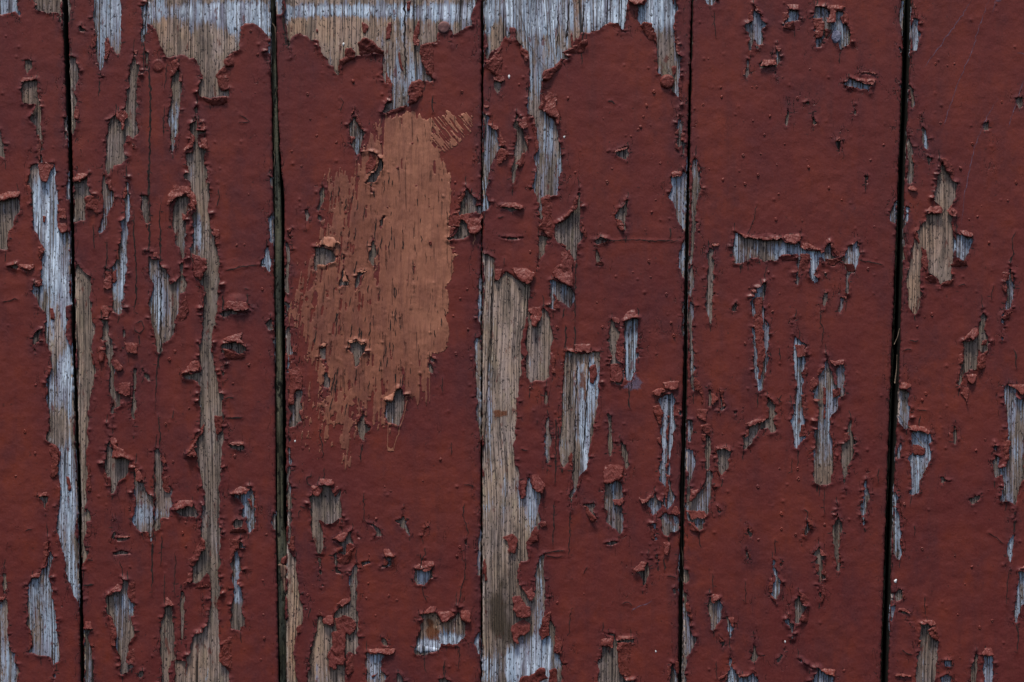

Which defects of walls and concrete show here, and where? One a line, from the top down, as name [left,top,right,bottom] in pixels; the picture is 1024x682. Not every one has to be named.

peeling [888,84,974,320]
peeling [0,0,682,682]
peeling [633,119,862,682]
peeling [891,382,933,568]
peeling [956,258,1019,405]
peeling [990,381,1024,632]